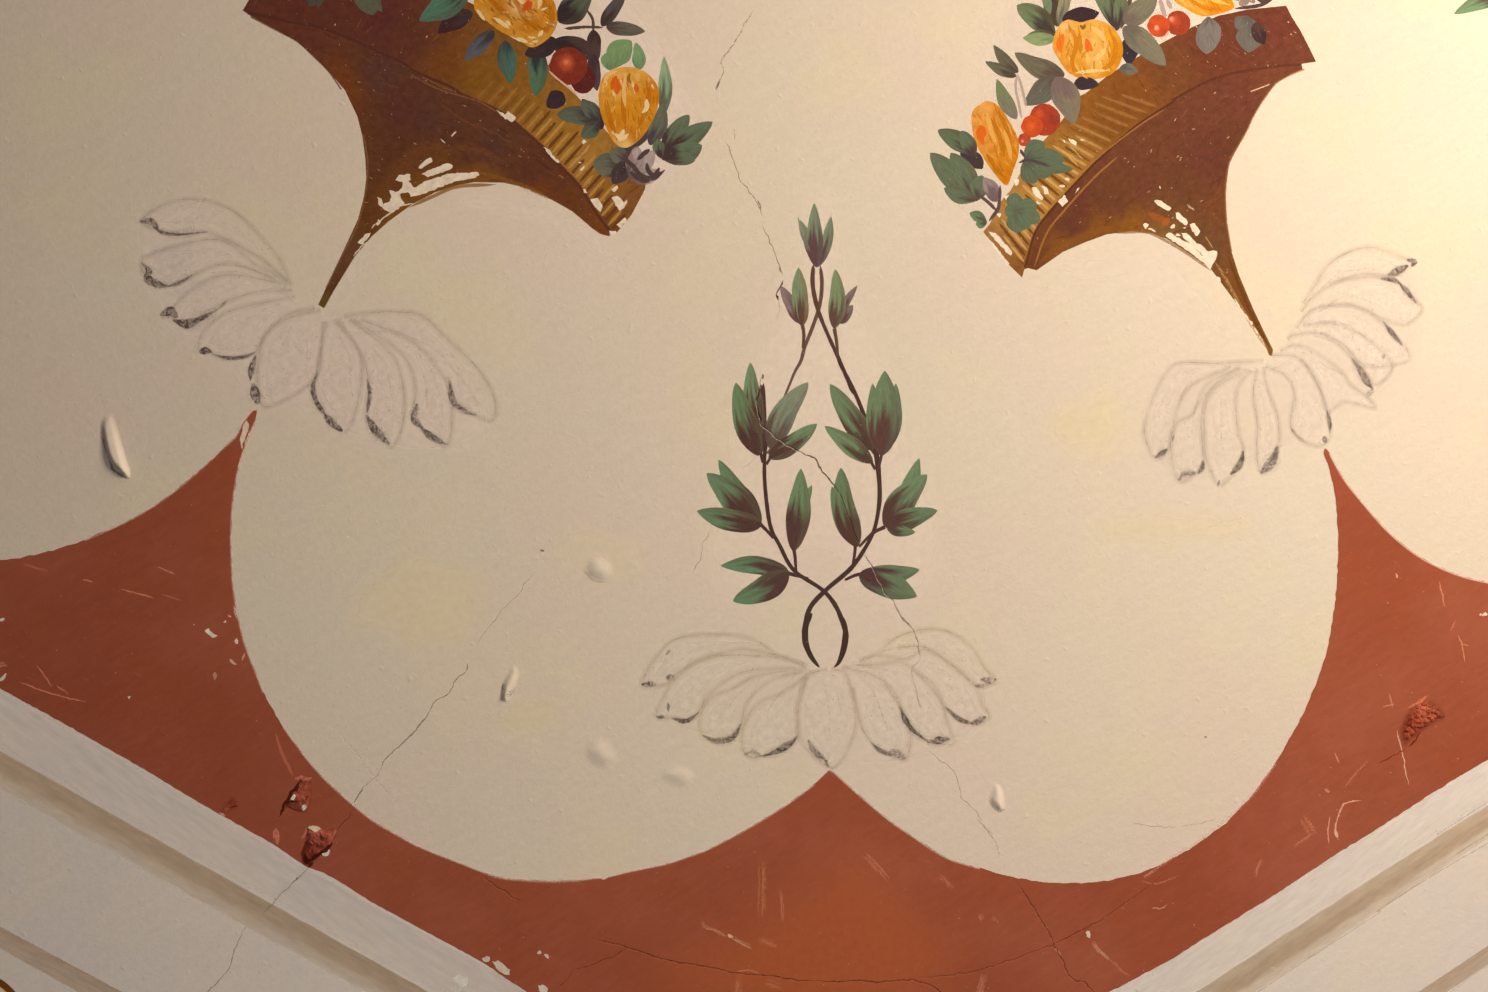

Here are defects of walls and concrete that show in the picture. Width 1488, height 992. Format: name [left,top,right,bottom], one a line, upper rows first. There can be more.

crack [716,13,752,88]
peeling [353,158,479,256]
crack [725,130,783,317]
peeling [1143,186,1221,281]
crack [336,576,532,830]
spalling [1380,696,1444,763]
spalling [273,775,337,867]
crack [207,868,308,992]
crack [561,938,941,992]
crack [1018,884,1094,992]